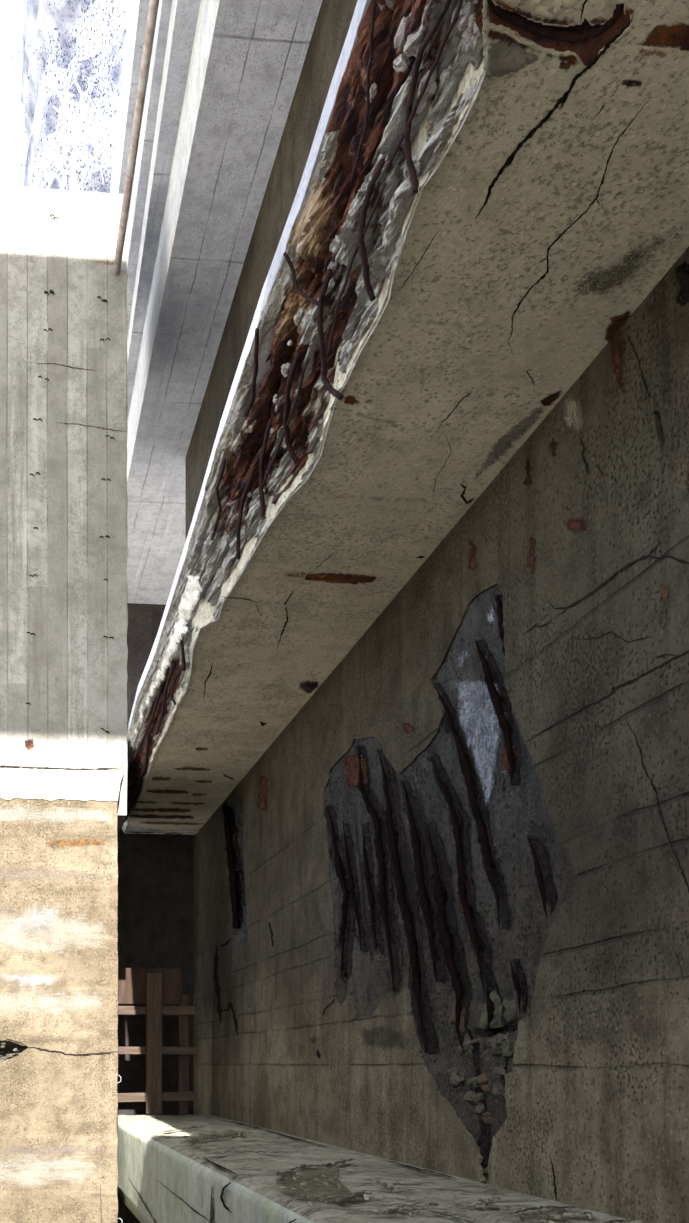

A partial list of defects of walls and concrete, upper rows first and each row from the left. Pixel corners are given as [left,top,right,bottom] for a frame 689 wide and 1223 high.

rust [640,23,689,56]
crack [475,20,632,219]
crack [508,100,649,387]
spalling [122,0,634,833]
rust [287,573,377,584]
crack [525,542,689,892]
crack [267,922,275,947]
spalling [324,585,643,1223]
crack [213,939,238,1036]
spalling [0,1040,28,1062]
crack [7,1039,115,1056]